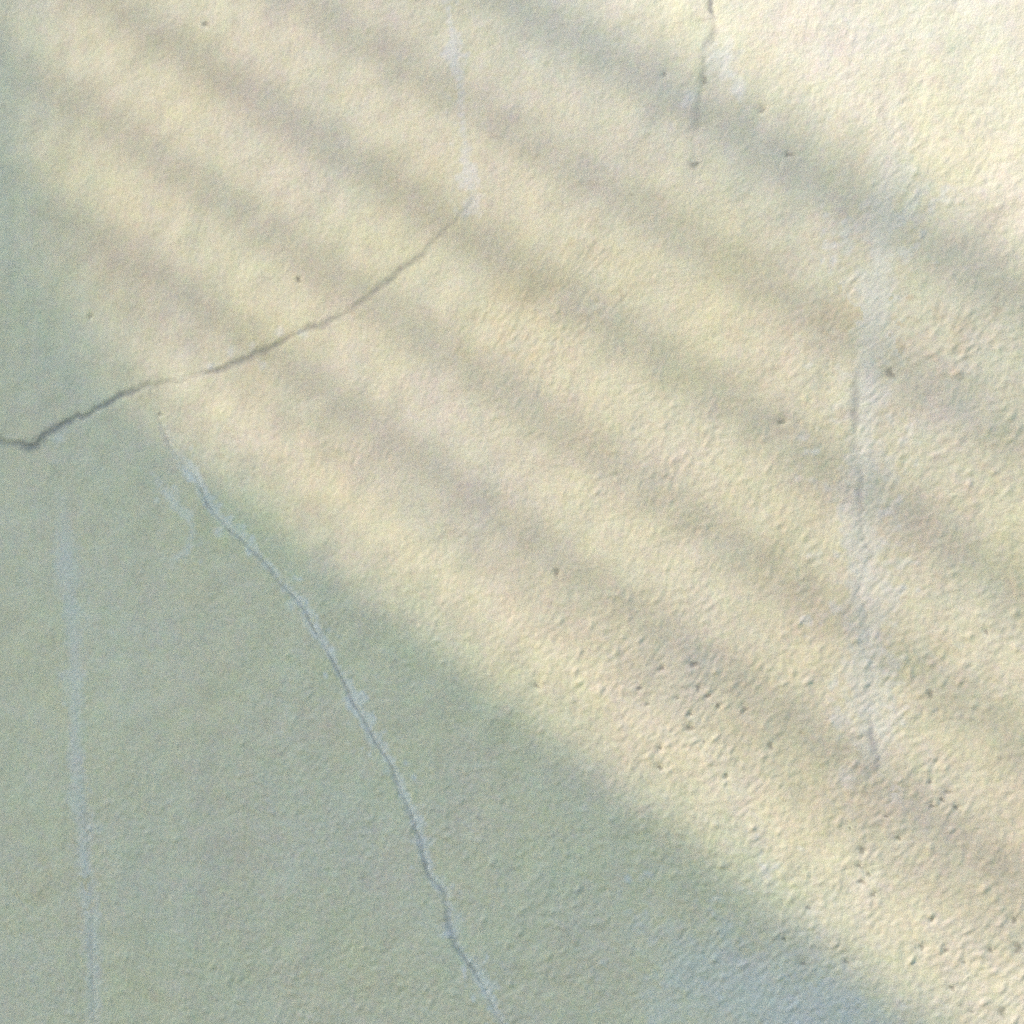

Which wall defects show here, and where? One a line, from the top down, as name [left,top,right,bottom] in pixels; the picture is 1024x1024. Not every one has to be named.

crack [680,33,755,129]
crack [206,325,309,372]
crack [50,424,72,444]
crack [146,424,510,1024]